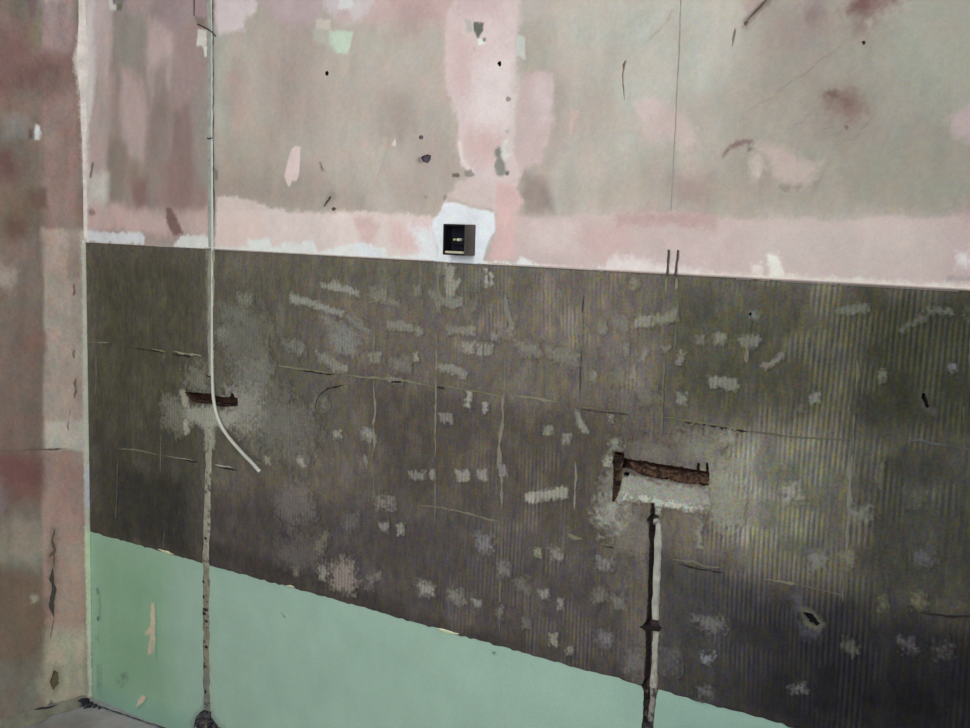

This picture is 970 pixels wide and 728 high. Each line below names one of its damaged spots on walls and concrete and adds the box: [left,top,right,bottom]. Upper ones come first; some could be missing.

crack [43,523,63,639]
peeling [144,601,157,659]